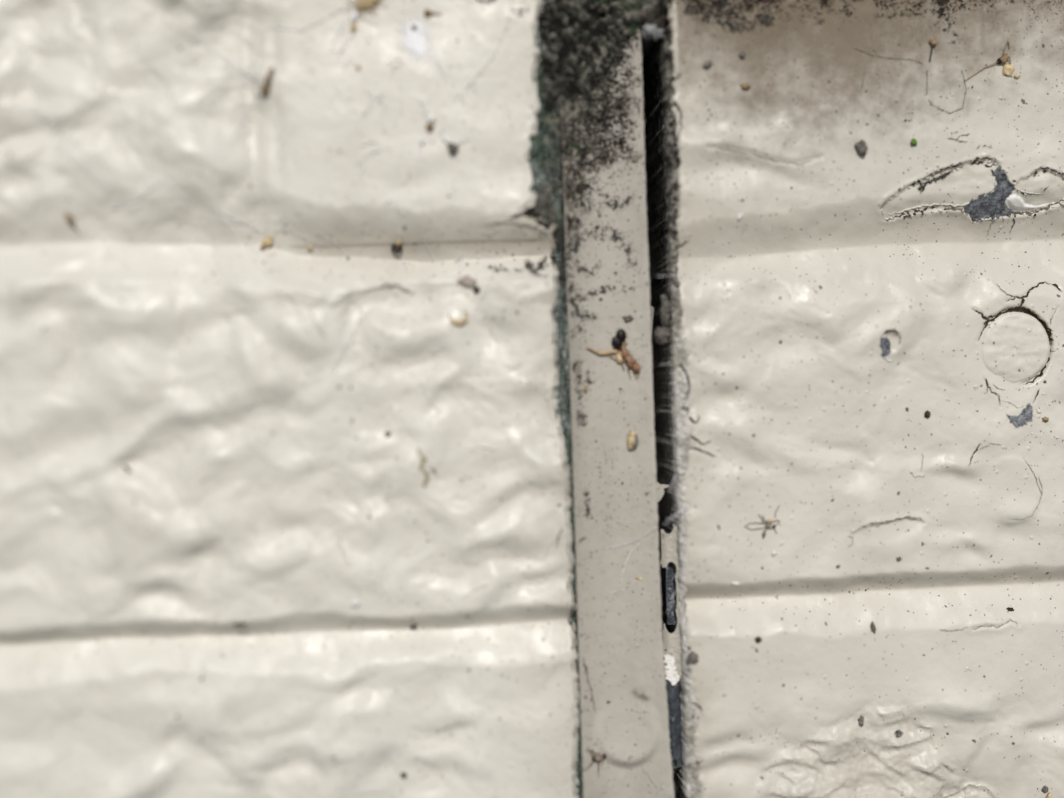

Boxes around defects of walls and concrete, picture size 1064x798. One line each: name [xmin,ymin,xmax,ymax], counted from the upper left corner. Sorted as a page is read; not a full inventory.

water stain [488,0,1037,338]
peeling [880,133,1064,236]
spalling [880,329,901,362]
water stain [572,359,595,428]
spalling [1006,403,1033,428]